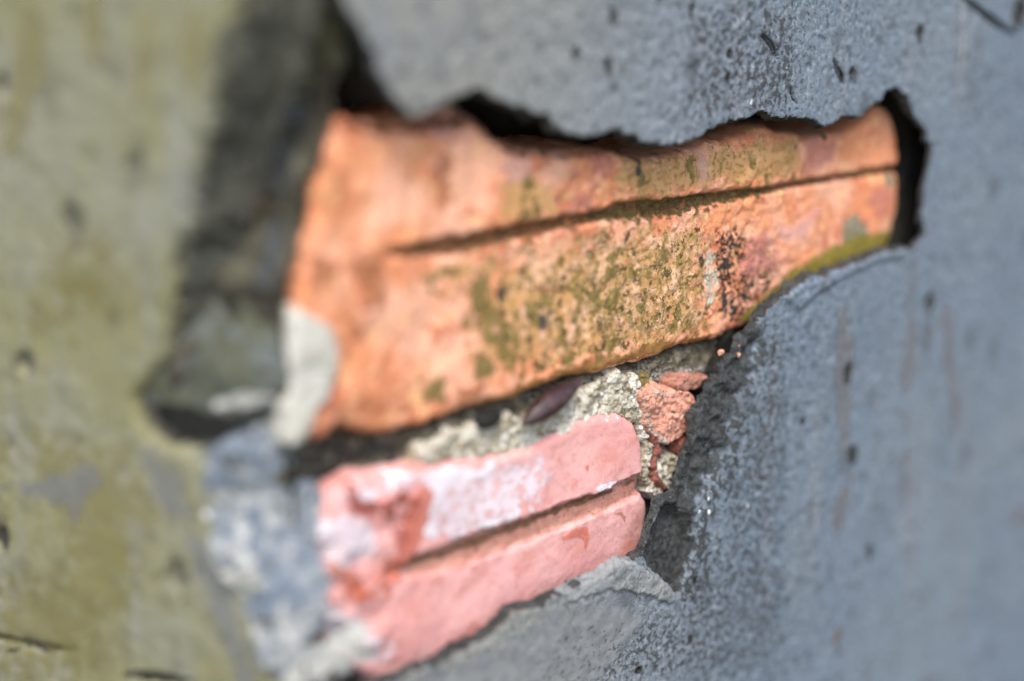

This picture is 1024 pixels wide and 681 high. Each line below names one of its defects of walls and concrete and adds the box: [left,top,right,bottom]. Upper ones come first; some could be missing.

water stain [354,250,386,306]
water stain [495,279,508,301]
water stain [699,225,779,322]
spalling [141,0,933,681]
water stain [432,332,717,419]